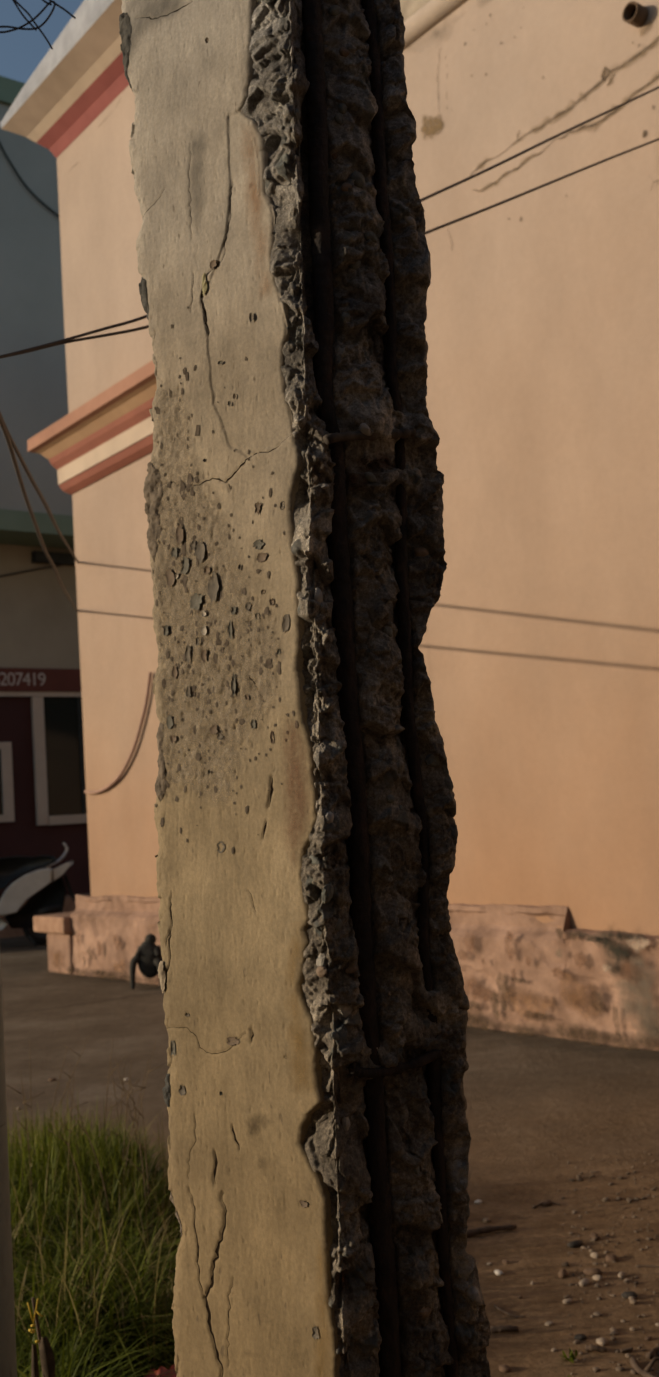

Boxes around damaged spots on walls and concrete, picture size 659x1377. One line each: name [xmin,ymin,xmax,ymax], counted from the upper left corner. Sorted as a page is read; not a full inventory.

crack [469,37,659,192]
crack [191,187,232,330]
crack [159,441,283,491]
spalling [143,0,491,1377]
crack [169,1027,254,1054]
leakage [464,929,659,1050]
crack [188,1122,240,1377]